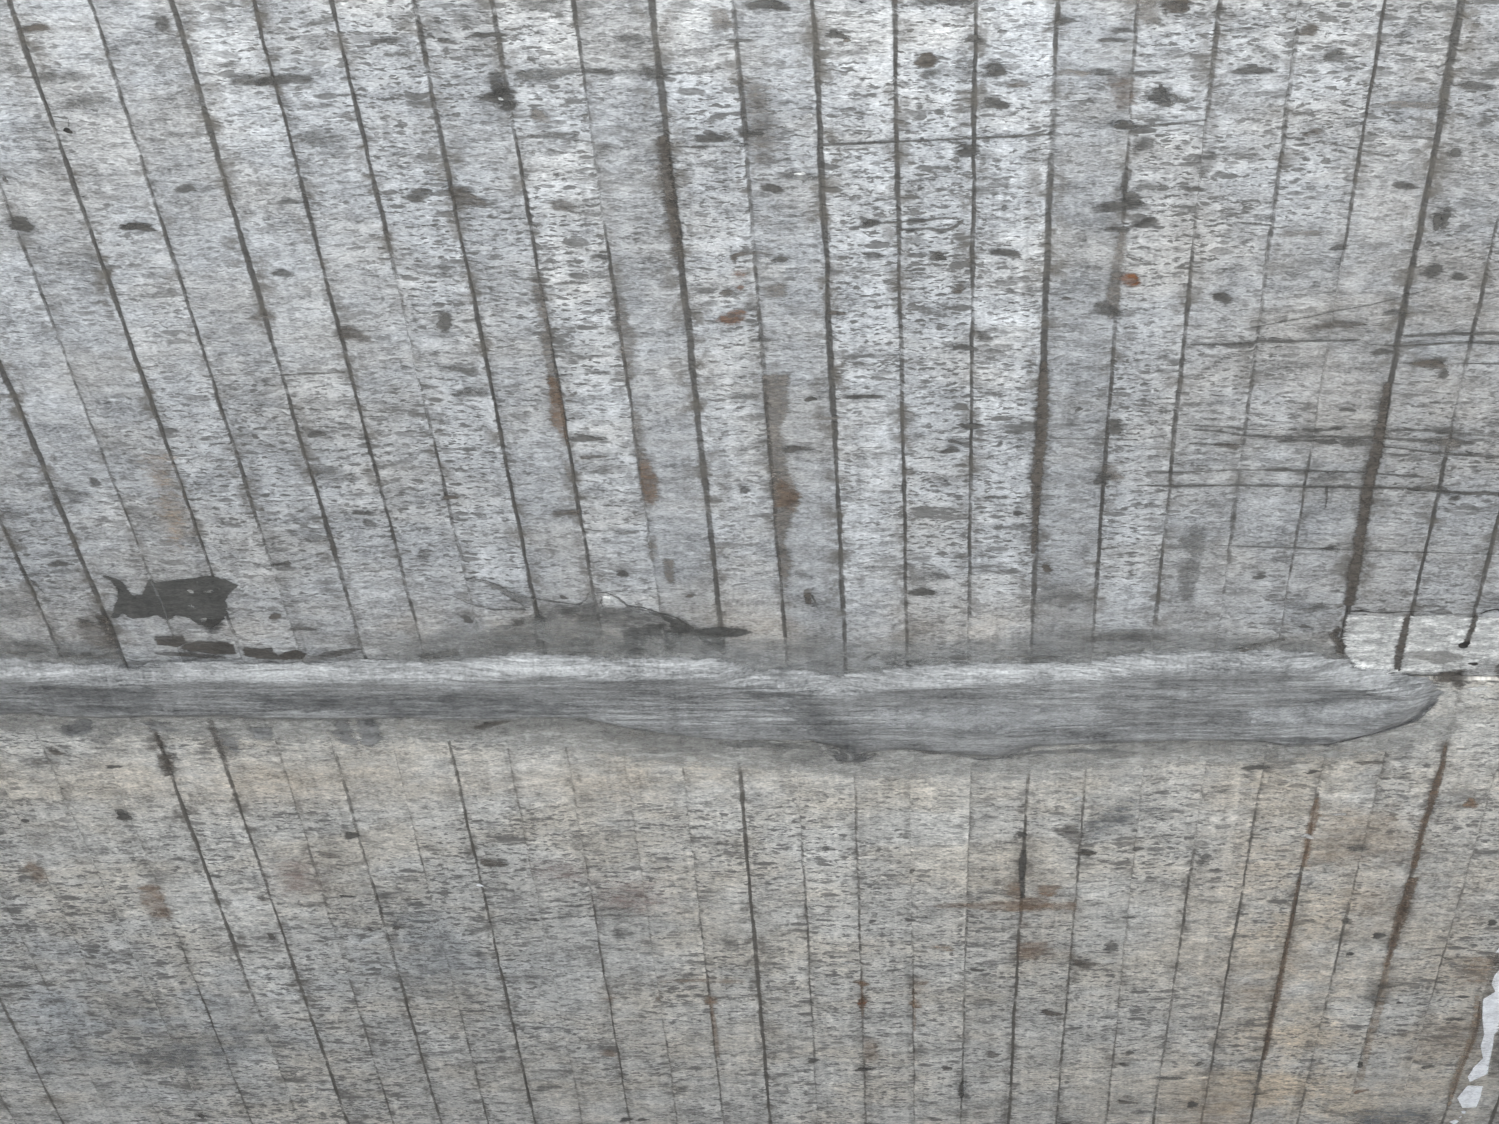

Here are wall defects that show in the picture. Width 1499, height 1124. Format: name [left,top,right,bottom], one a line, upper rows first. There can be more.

water stain [57,613,122,660]
water stain [1086,632,1169,642]